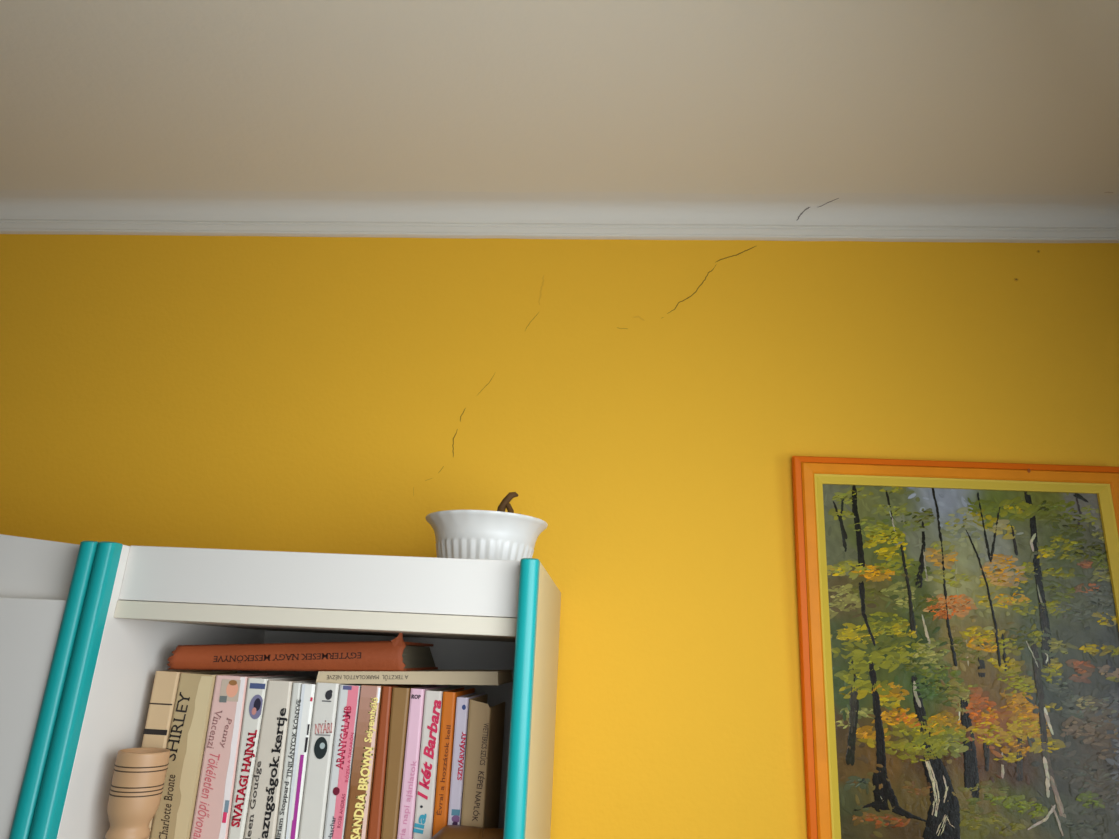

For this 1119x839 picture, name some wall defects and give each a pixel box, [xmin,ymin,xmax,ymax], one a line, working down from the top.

crack [619,246,755,329]
crack [413,375,494,496]